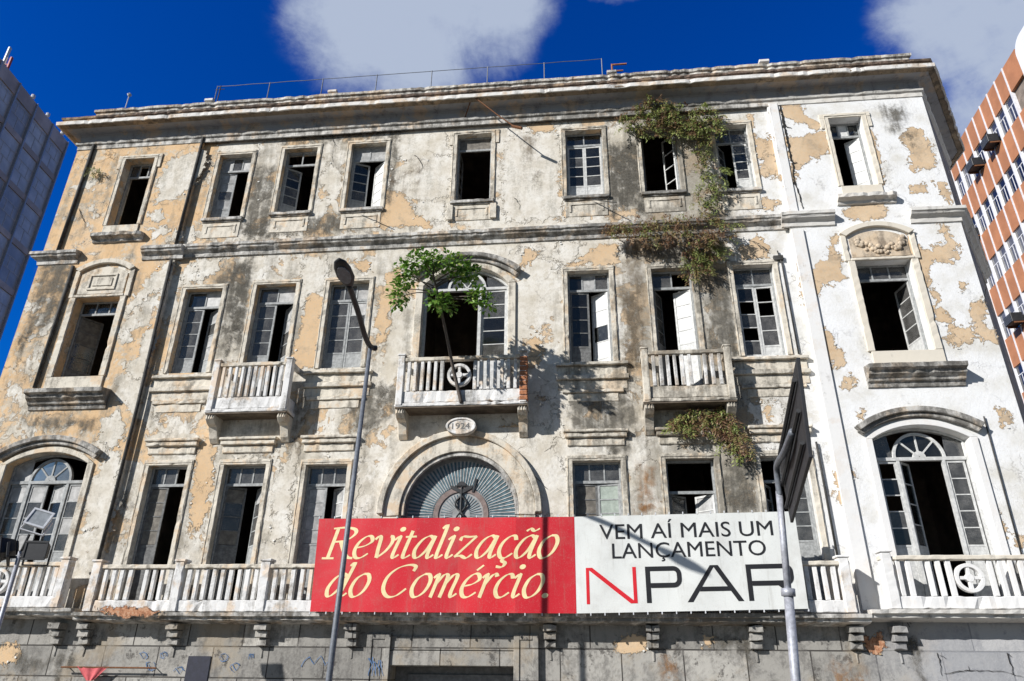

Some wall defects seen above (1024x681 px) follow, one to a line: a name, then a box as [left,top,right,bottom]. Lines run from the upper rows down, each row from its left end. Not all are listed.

peeling [368,128,453,231]
flaking render [746,105,830,187]
damp [884,108,903,131]
flaking render [898,127,954,205]
flaking render [290,254,332,369]
flaking render [520,240,621,271]
flaking render [796,231,849,306]
flaking render [906,223,1001,349]
flaking render [993,406,1015,429]
flaking render [186,437,218,531]
spalling [94,604,163,620]
flaking render [612,633,649,656]